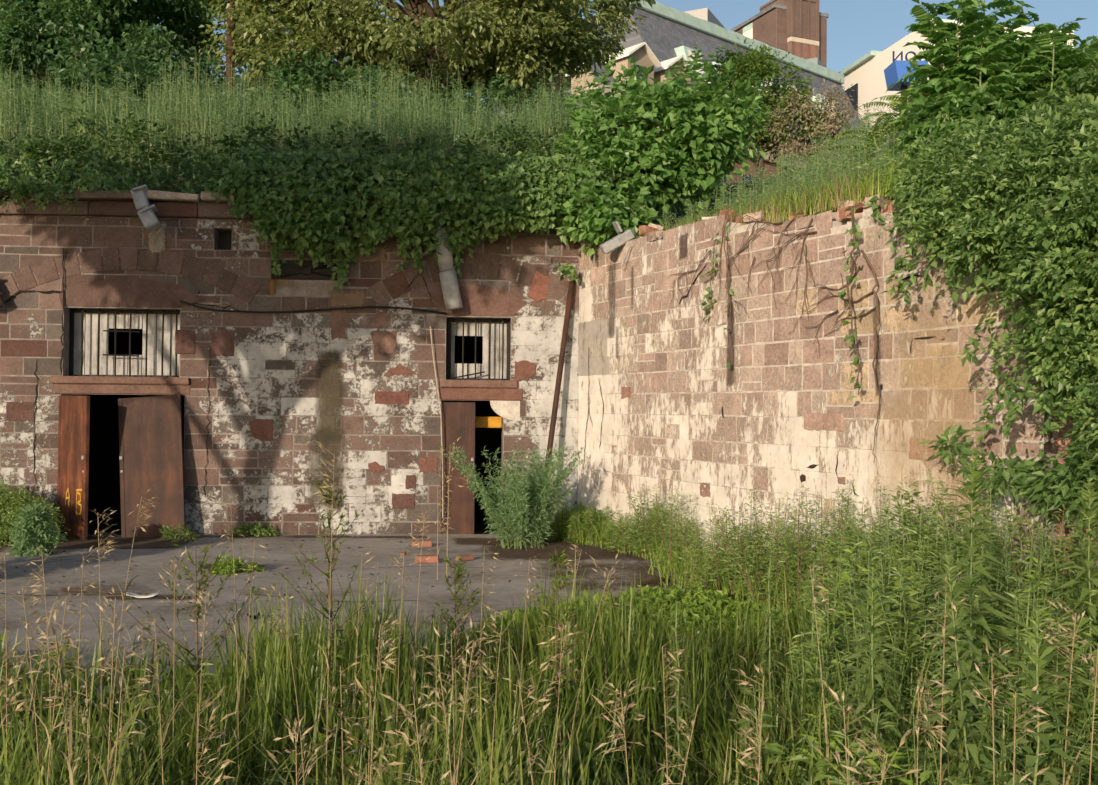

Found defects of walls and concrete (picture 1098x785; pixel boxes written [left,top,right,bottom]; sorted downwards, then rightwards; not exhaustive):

peeling [159,218,269,292]
peeling [8,307,45,339]
peeling [0,376,59,503]
peeling [175,288,443,535]
leakage [309,351,343,507]